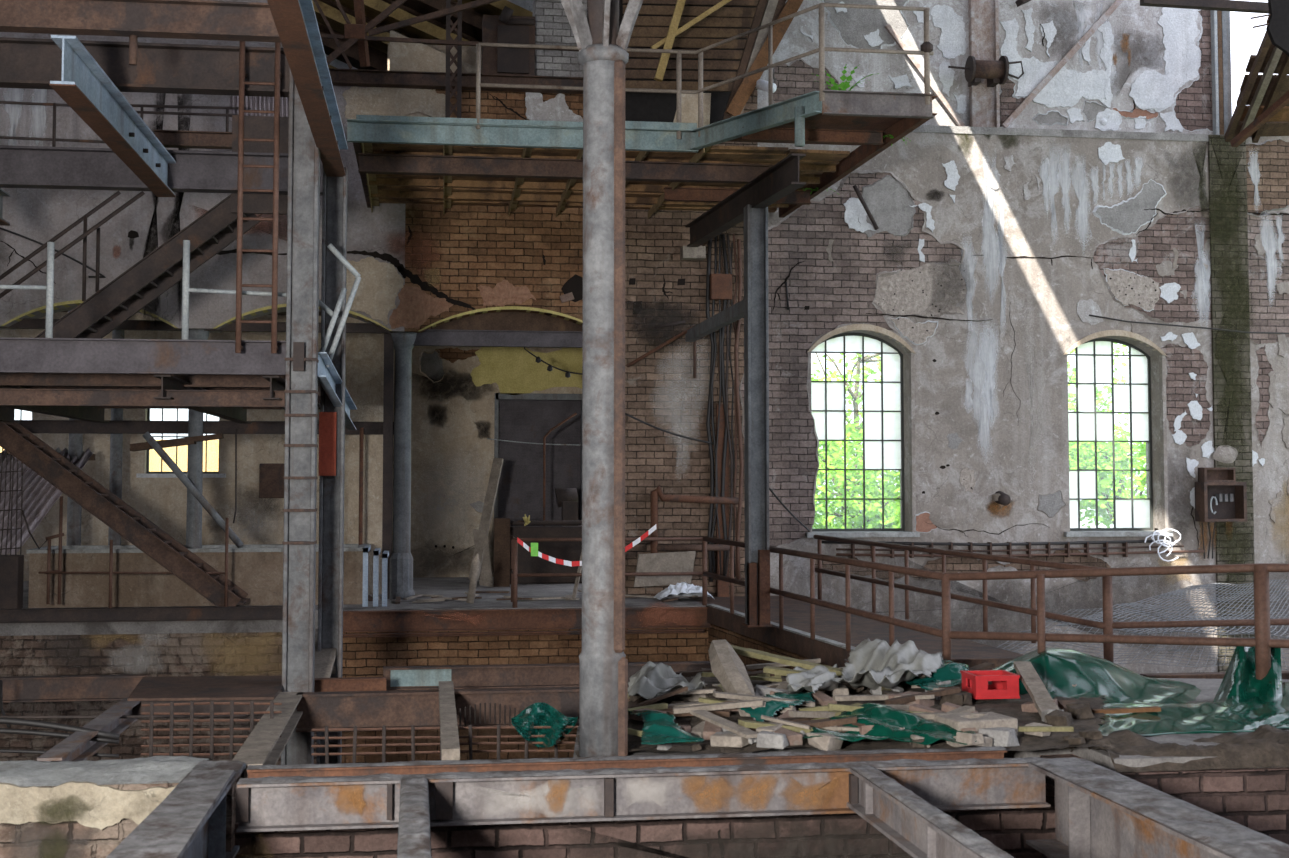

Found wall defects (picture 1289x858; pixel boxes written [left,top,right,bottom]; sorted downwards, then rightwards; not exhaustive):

peeling [1000,0,1213,165]
crack [347,226,476,310]
flaking render [768,170,970,553]
peeling [942,160,960,203]
damp [940,187,1005,314]
efflorescence [966,347,994,439]
crack [965,254,1093,269]
efflorescence [1042,163,1141,233]
flaking render [1077,179,1214,509]
flaking render [1246,139,1289,467]